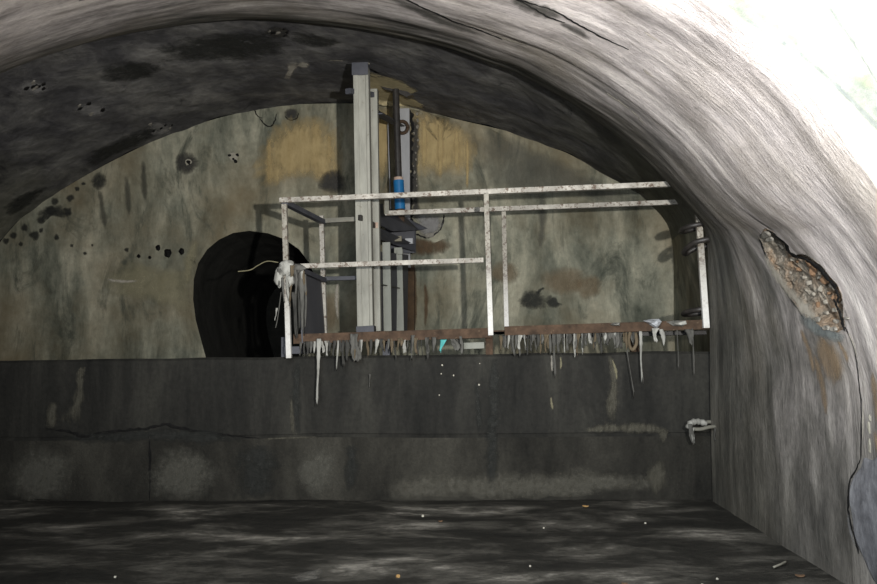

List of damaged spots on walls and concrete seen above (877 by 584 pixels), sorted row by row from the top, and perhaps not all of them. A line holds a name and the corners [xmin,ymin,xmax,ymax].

crack [513,0,629,50]
spalling [758,229,850,340]
crack [845,327,864,460]